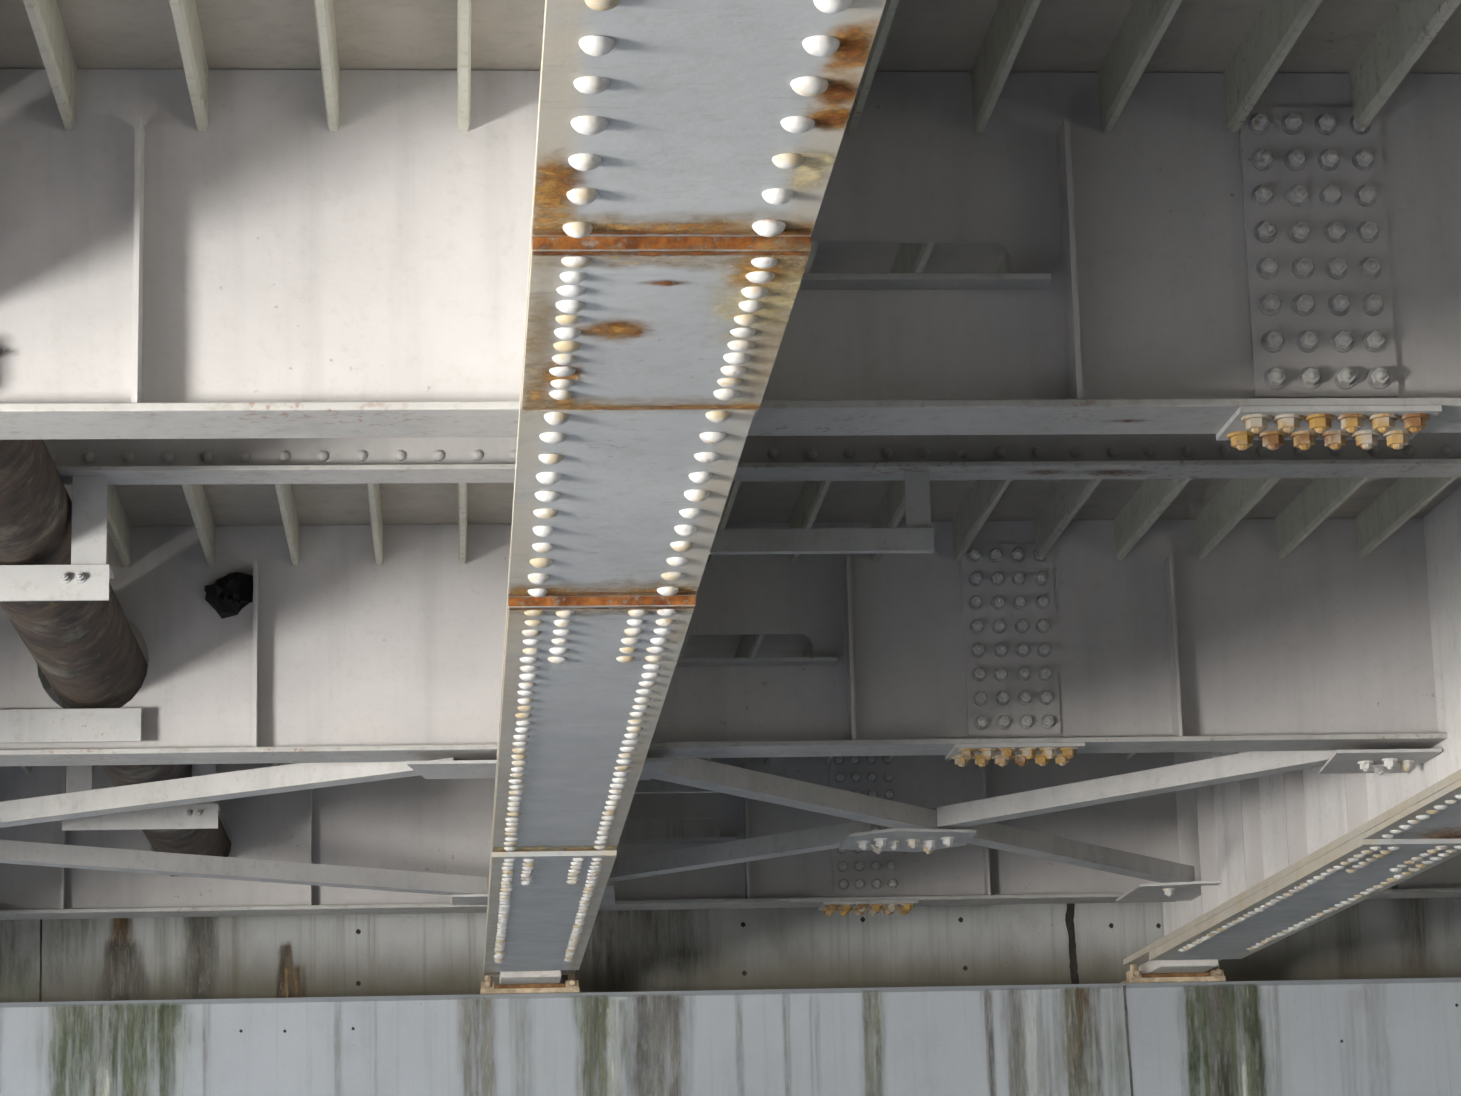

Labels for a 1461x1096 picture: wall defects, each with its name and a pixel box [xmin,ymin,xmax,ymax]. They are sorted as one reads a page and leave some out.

rust [808,26,872,128]
rust [792,155,833,187]
rust [532,165,811,381]
rust [523,297,760,411]
rust [508,583,696,613]
water stain [186,917,214,997]
crack [1065,903,1079,984]
water stain [53,1005,176,1096]
water stain [1186,986,1264,1096]